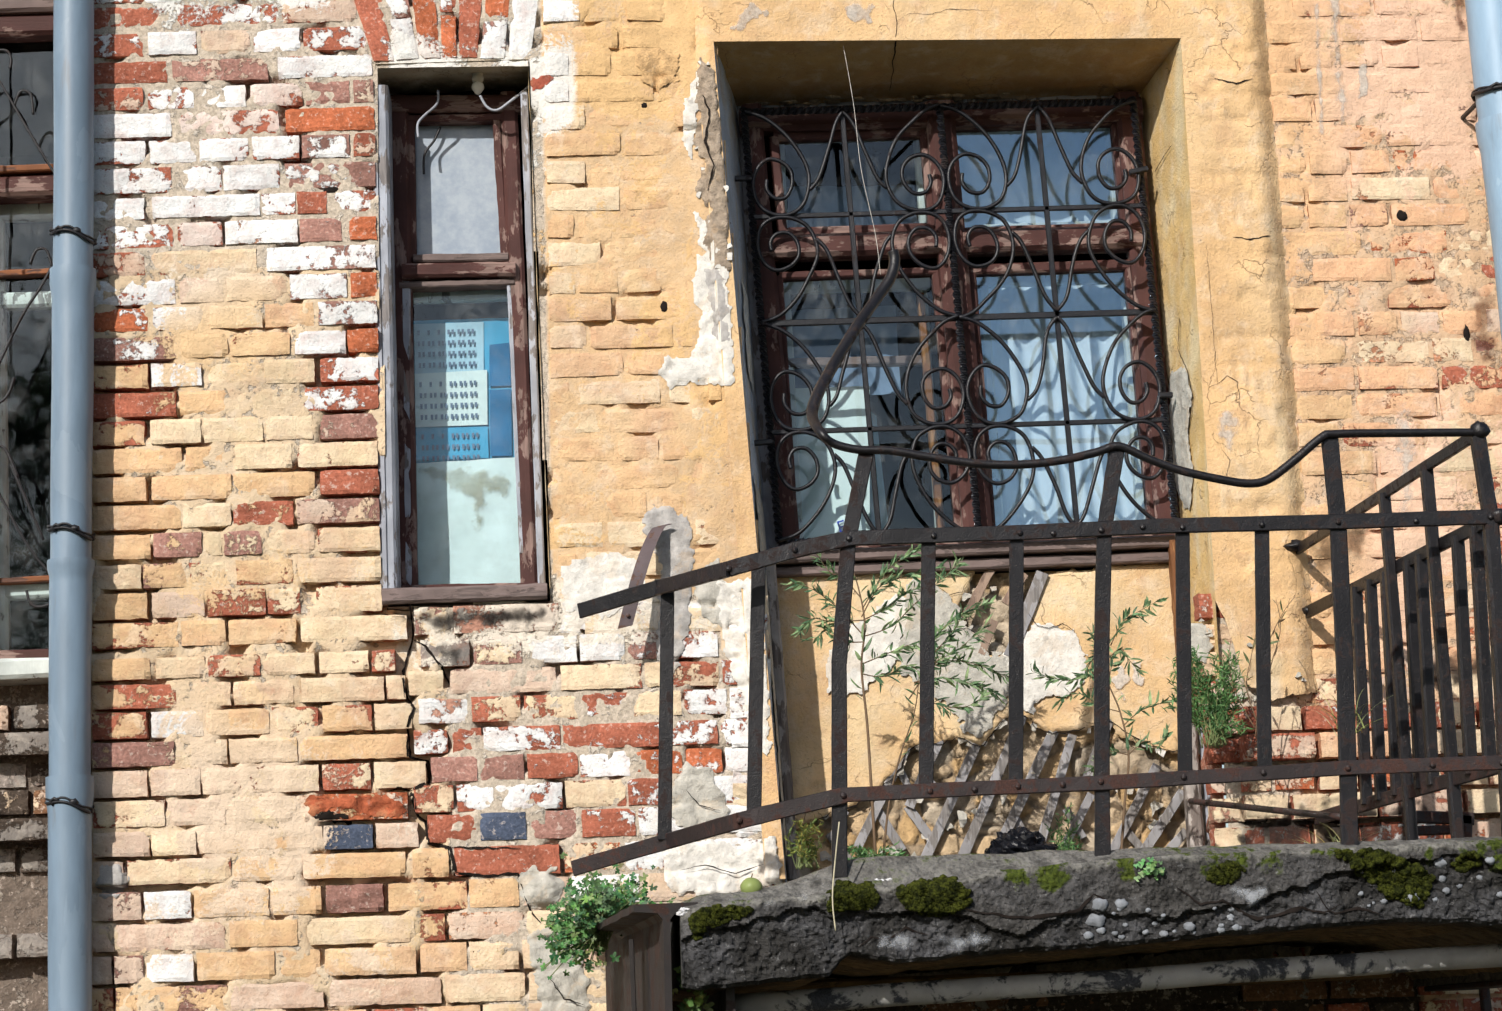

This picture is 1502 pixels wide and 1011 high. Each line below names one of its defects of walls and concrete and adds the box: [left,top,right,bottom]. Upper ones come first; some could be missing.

crack [890,0,989,88]
flaking render [635,48,754,390]
peeling [754,474,767,551]
crack [389,604,540,922]
flaking render [662,558,859,896]
peeling [826,579,1178,786]
flaking render [1191,619,1214,663]